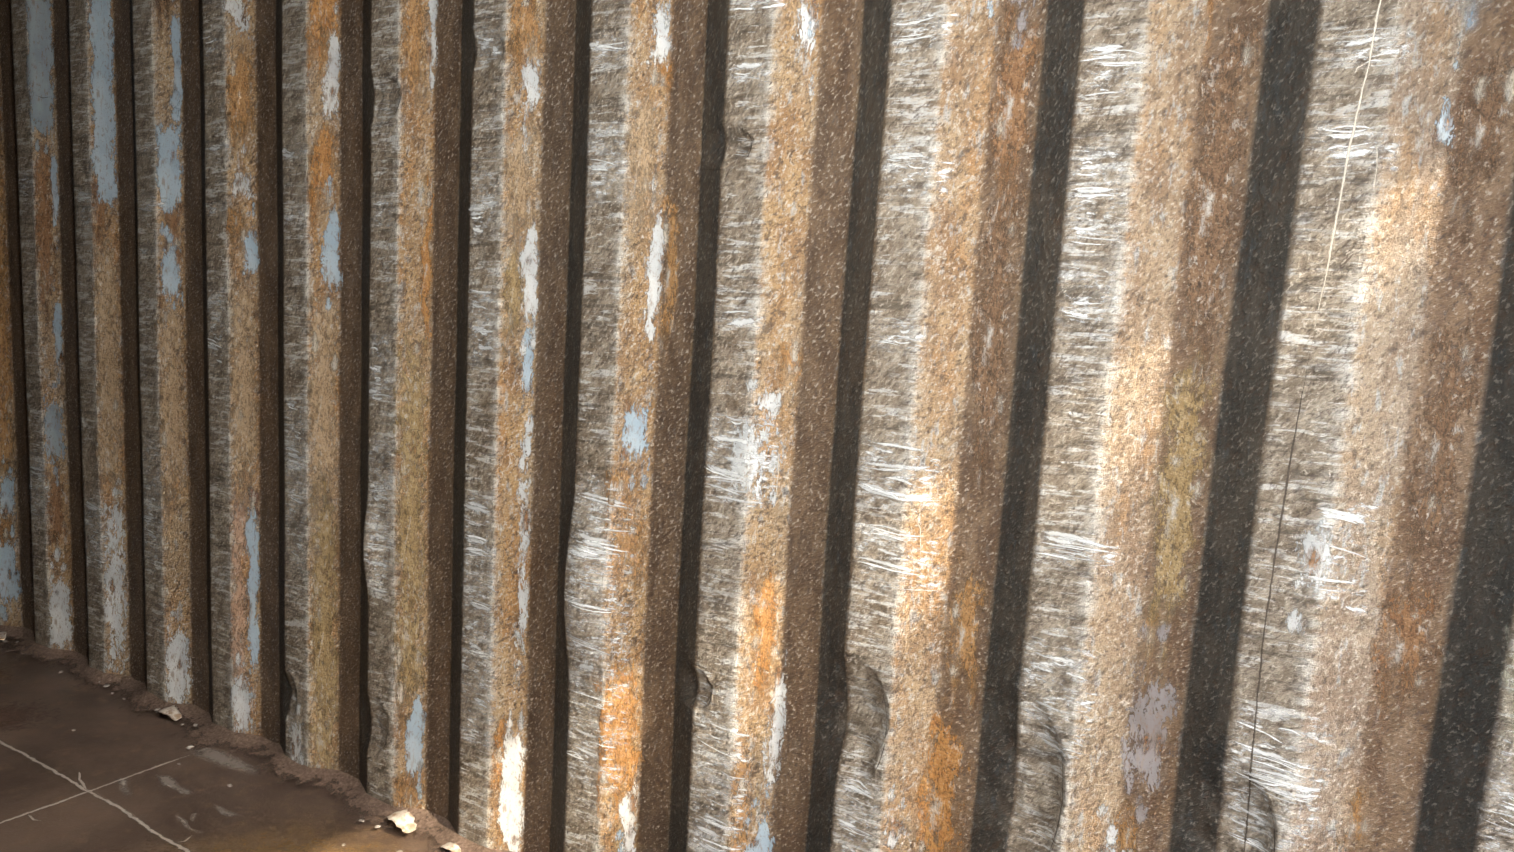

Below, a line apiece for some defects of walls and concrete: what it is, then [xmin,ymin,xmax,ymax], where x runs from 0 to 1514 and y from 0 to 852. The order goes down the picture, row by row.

corrosion [225,47,255,150]
corrosion [400,0,426,114]
corrosion [964,4,1042,483]
corrosion [226,279,260,732]
corrosion [390,175,434,721]
corrosion [776,340,803,407]
corrosion [1143,0,1261,682]
corrosion [593,652,642,825]
corrosion [727,729,752,852]
corrosion [751,569,780,709]
corrosion [914,555,988,852]
corrosion [1108,800,1139,852]